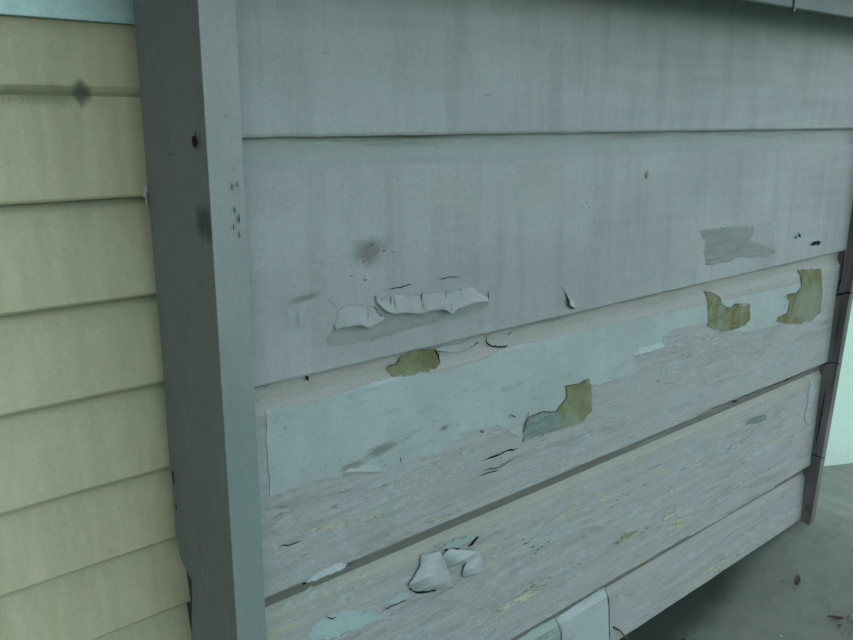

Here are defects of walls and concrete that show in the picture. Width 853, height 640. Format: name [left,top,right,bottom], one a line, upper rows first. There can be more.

peeling [265,268,823,495]
peeling [305,533,484,640]
peeling [519,587,610,640]